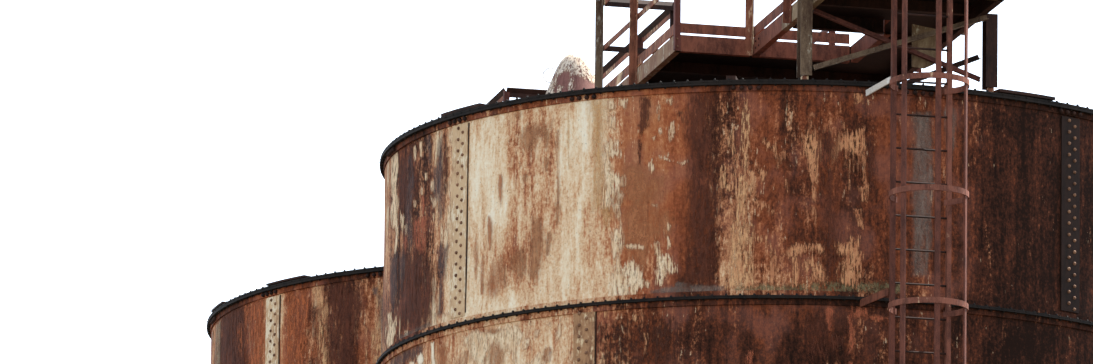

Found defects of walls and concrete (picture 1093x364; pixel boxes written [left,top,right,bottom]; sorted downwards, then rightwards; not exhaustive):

peeling [546,53,595,93]
rust [521,126,559,171]
peeling [387,127,453,253]
peeling [601,97,678,296]
peeling [719,97,869,289]
rust [475,217,551,294]
rust [237,299,264,364]
peeling [409,342,435,364]
peeling [429,277,454,327]
rust [825,307,833,330]
rust [848,308,888,364]